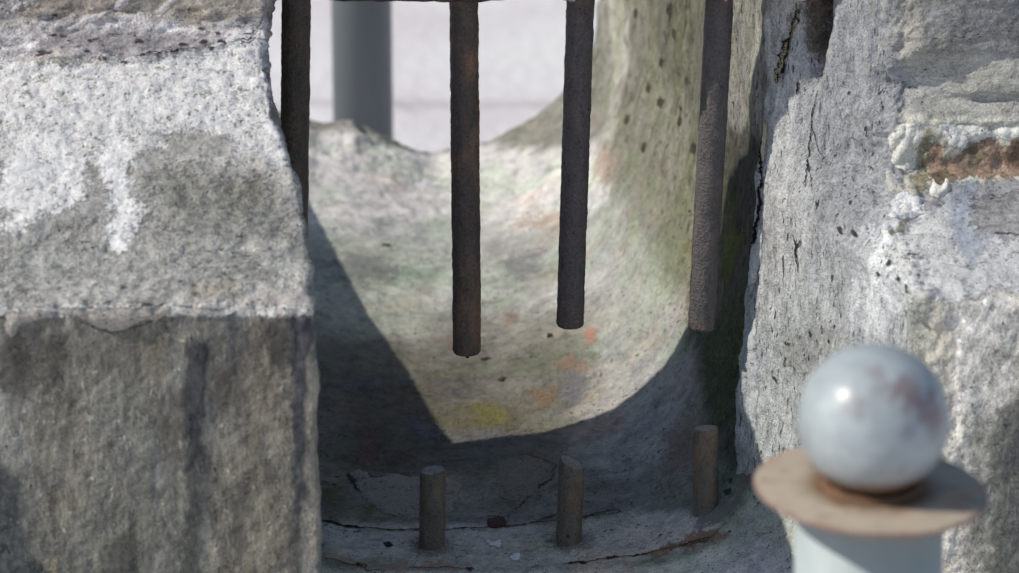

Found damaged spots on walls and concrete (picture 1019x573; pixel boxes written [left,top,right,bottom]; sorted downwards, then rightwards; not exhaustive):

leakage [0,27,308,268]
crack [774,5,824,186]
spalling [842,104,1019,198]
leakage [174,288,315,573]
leakage [0,467,45,573]
crack [322,520,419,531]
crack [445,513,557,530]